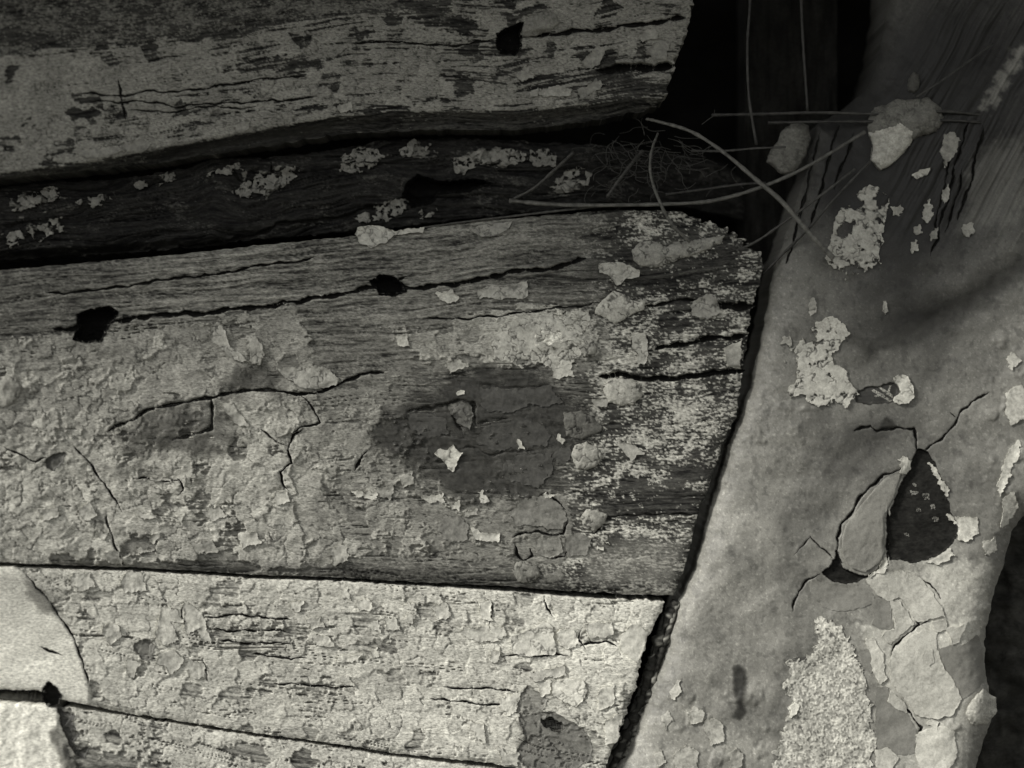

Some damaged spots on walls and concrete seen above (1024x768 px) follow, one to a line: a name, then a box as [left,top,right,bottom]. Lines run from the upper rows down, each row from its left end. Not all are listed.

crack [77,76,314,120]
peeling [355,198,437,248]
peeling [825,185,904,281]
crack [49,257,600,332]
peeling [780,297,914,408]
crack [109,371,384,491]
leakage [373,365,589,504]
peeling [407,310,610,558]
crack [854,392,989,452]
crack [792,468,901,612]
spalling [772,440,1021,768]
peeling [461,600,648,768]